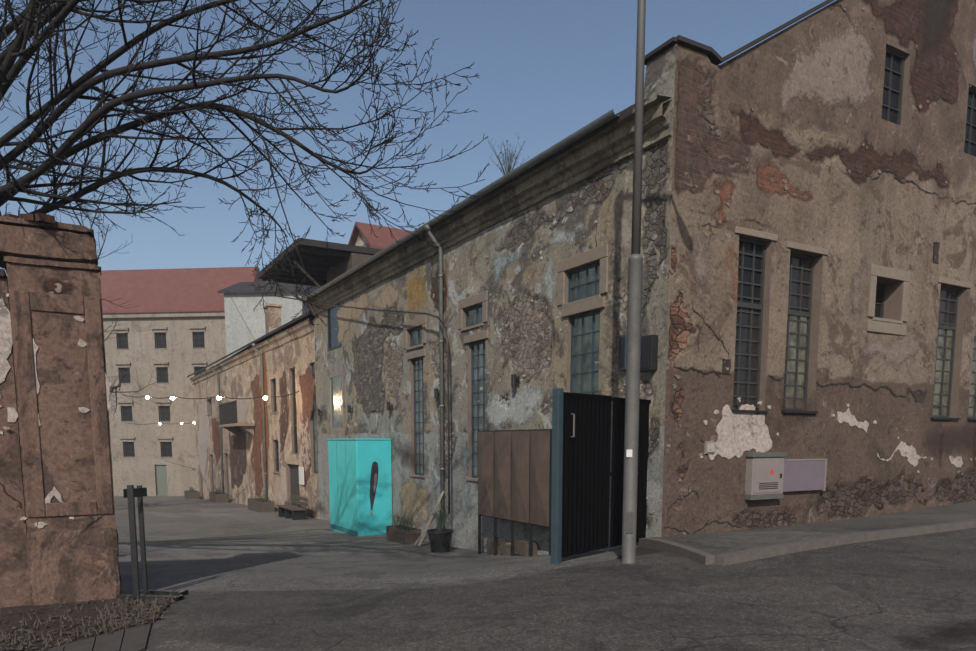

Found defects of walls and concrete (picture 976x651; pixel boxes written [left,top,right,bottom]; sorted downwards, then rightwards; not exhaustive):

peeling [780,0,971,115]
flaking render [478,61,949,433]
peeling [0,293,13,383]
flaking render [335,265,447,418]
peeling [0,395,18,435]
flaking render [198,374,263,496]
flaking render [648,418,688,481]
peeling [699,397,779,460]
flaking render [817,436,976,518]